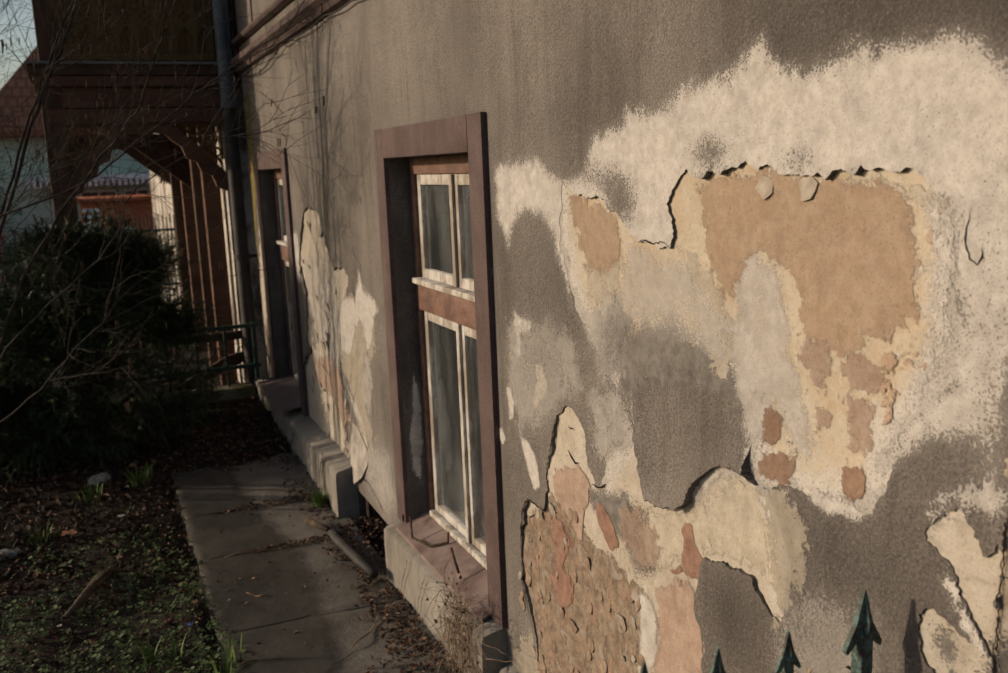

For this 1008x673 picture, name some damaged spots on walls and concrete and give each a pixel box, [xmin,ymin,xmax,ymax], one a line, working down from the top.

flaking render [298,208,368,484]
flaking render [518,163,965,673]
leakage [493,24,1008,673]
flaking render [919,509,1008,673]
crack [993,518,1008,673]